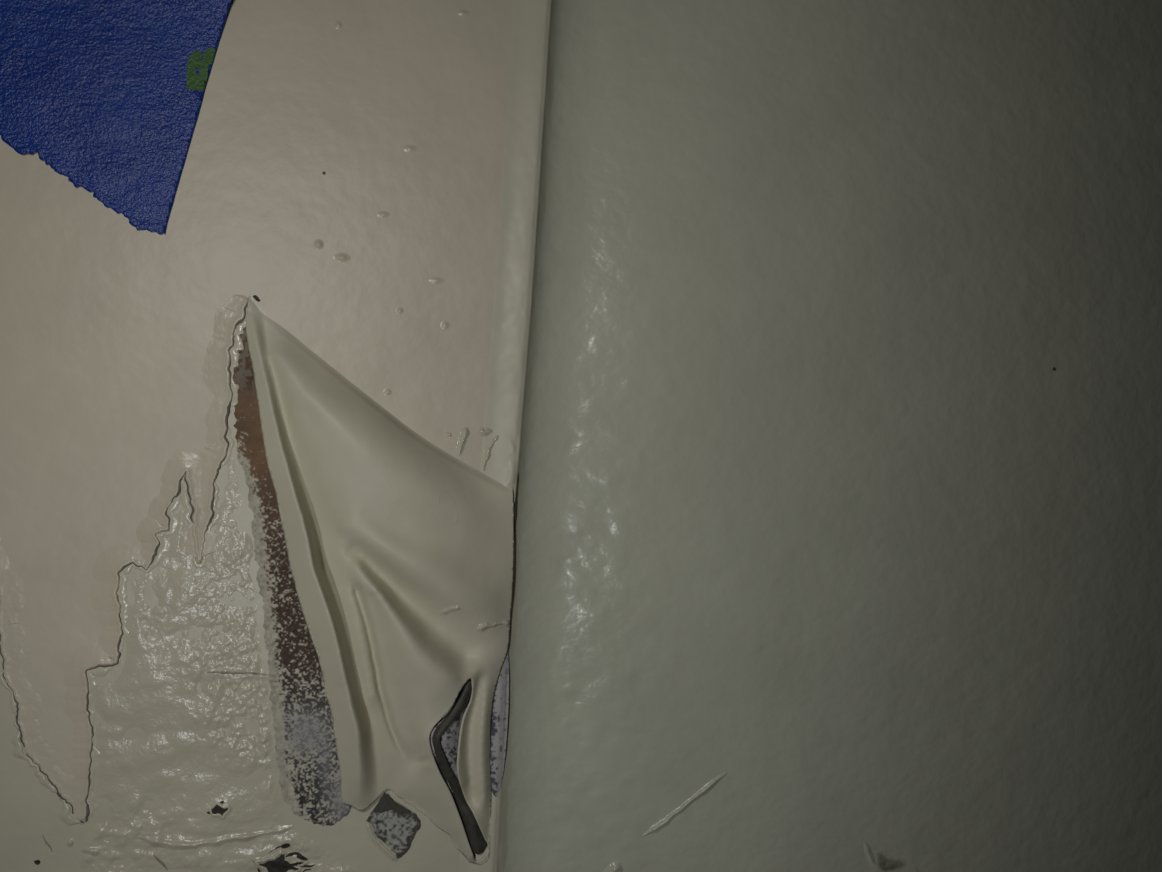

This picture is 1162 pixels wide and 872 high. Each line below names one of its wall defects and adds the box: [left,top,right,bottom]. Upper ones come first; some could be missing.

peeling [233,295,514,865]
peeling [207,801,233,820]
peeling [253,843,314,872]